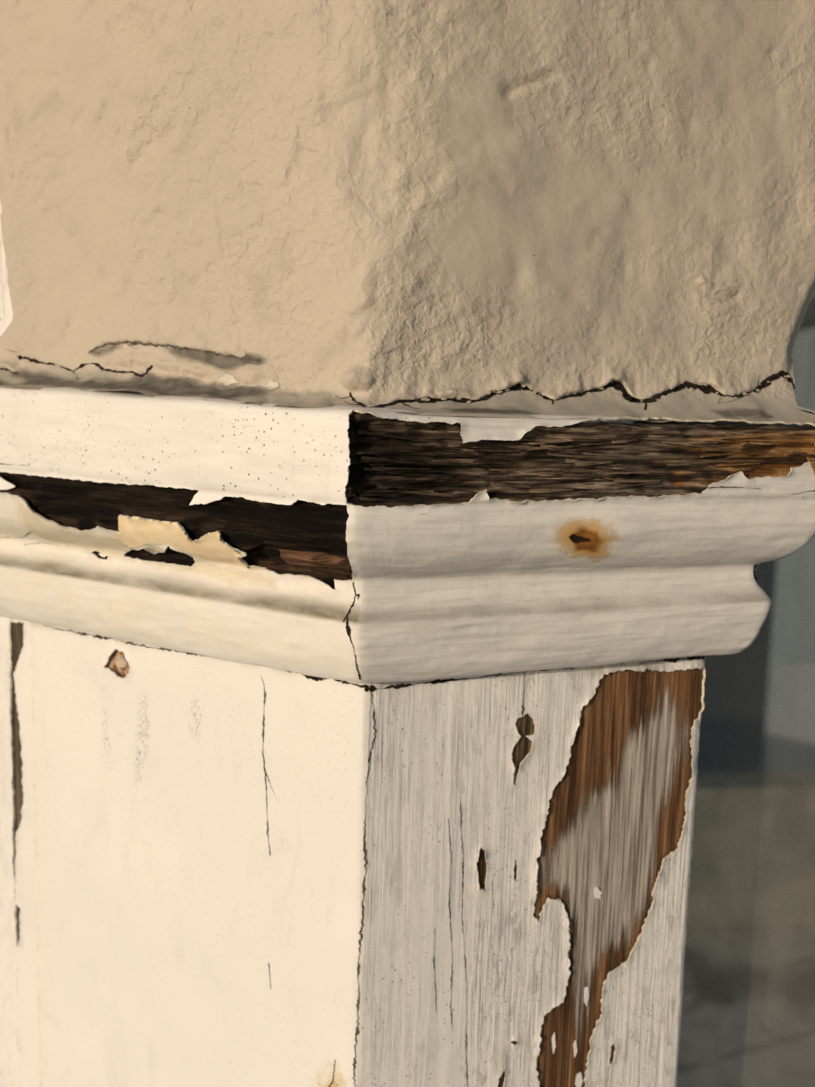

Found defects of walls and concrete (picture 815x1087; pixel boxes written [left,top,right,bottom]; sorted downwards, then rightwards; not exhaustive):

crack [0,313,262,377]
crack [338,351,815,415]
peeling [0,477,16,490]
peeling [115,516,260,570]
corrosion [558,521,615,558]
spalling [106,649,130,678]
crack [44,625,201,656]
peeling [12,622,24,831]
peeling [512,713,535,784]
crack [260,583,575,1087]
peeling [533,668,703,1087]